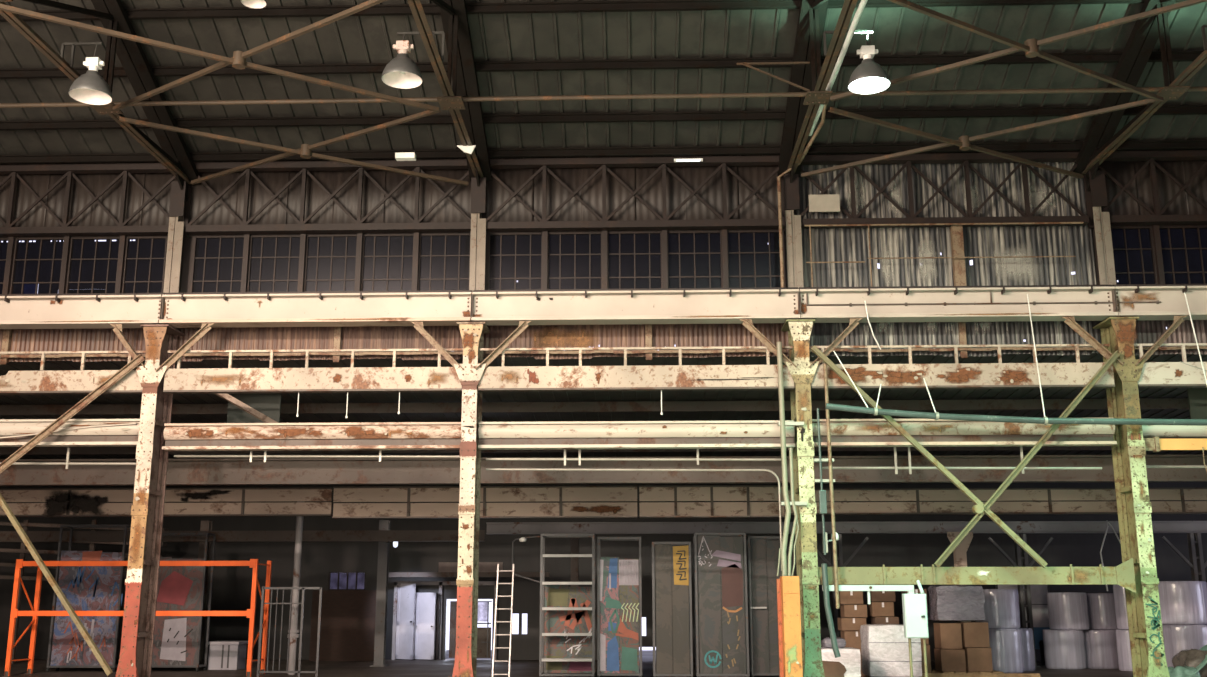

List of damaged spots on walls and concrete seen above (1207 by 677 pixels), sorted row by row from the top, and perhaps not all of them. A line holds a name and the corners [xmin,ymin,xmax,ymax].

rust [502,369,539,384]
rust [185,426,257,437]
rust [273,428,323,438]
rust [341,426,413,437]
peeling [787,646,799,674]